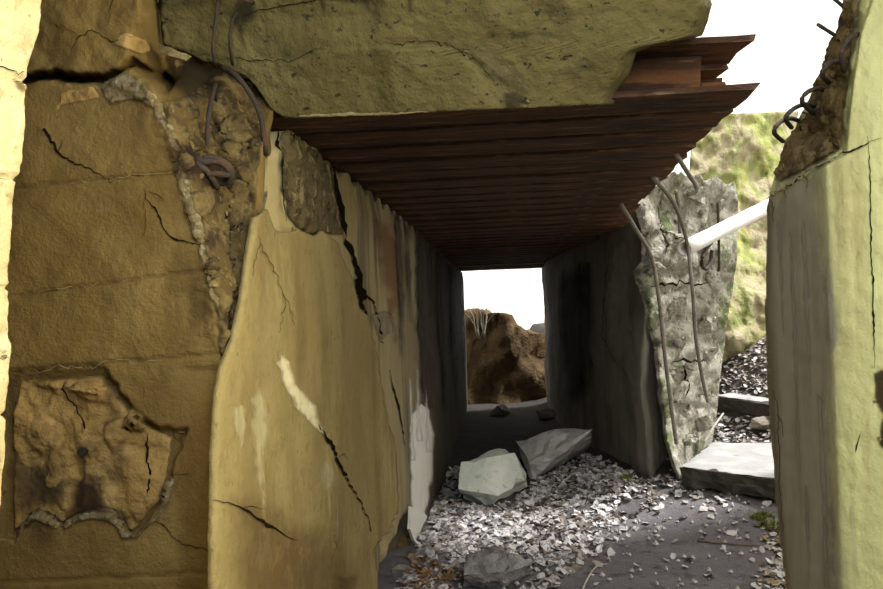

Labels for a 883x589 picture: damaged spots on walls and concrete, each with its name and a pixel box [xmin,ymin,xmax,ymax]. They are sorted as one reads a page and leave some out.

crack [209,35,328,63]
crack [244,0,316,17]
spalling [766,0,860,199]
crack [42,128,199,245]
rust [175,144,234,185]
crack [766,136,879,368]
flaking render [55,72,427,589]
spalling [13,377,186,541]
crack [216,500,298,541]
crack [318,424,372,531]